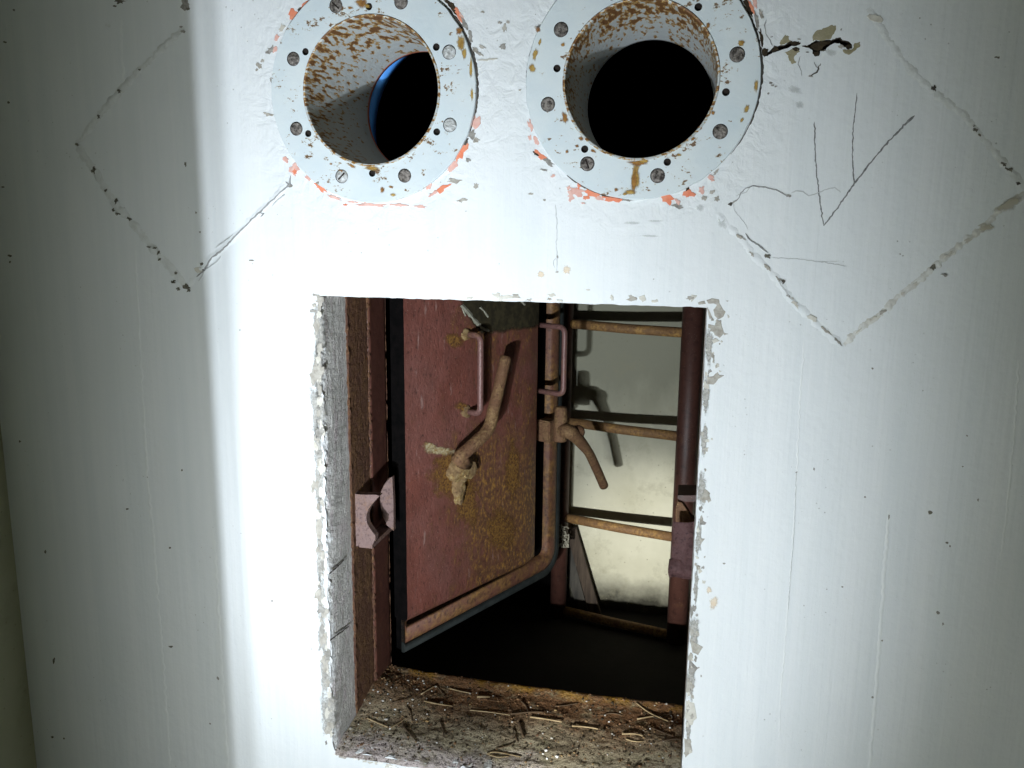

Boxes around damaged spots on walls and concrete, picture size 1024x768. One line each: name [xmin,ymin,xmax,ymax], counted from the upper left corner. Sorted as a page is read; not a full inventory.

corrosion [457,28,472,76]
crack [732,0,764,152]
spalling [743,0,860,77]
crack [194,176,293,280]
peeling [283,116,481,208]
corrosion [615,160,648,195]
peeling [661,169,720,209]
crack [728,185,841,229]
crack [777,258,843,266]
spalling [686,295,730,412]
spalling [309,293,396,768]
spalling [684,468,711,757]